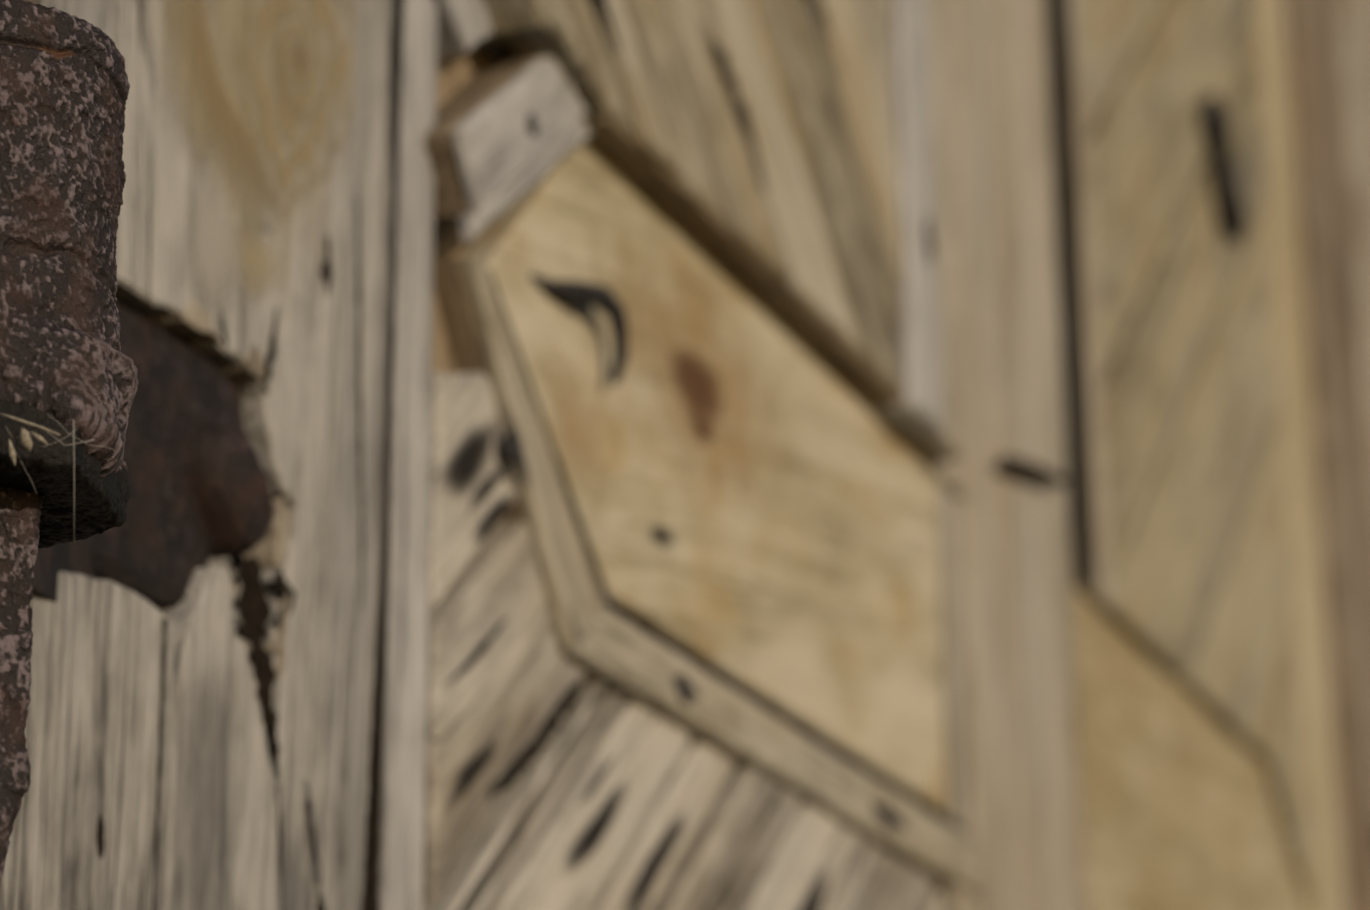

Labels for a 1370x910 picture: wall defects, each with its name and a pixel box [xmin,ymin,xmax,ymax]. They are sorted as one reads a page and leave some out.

peeling [147,300,222,343]
peeling [244,497,290,678]